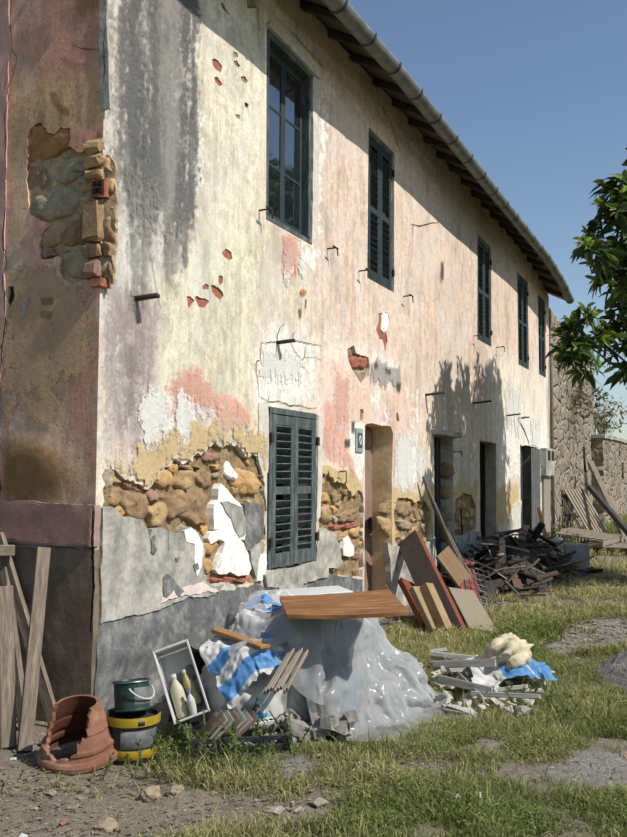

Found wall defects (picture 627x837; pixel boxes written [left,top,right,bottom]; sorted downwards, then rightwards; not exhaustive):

crack [0,0,18,373]
damp [97,0,202,311]
spalling [0,125,119,443]
flaking render [187,276,222,308]
crack [256,324,319,409]
peeling [324,347,402,478]
flaking render [376,312,389,348]
spalling [102,364,268,603]
spalling [318,474,362,577]
spalling [377,431,428,546]
spalling [454,493,474,536]